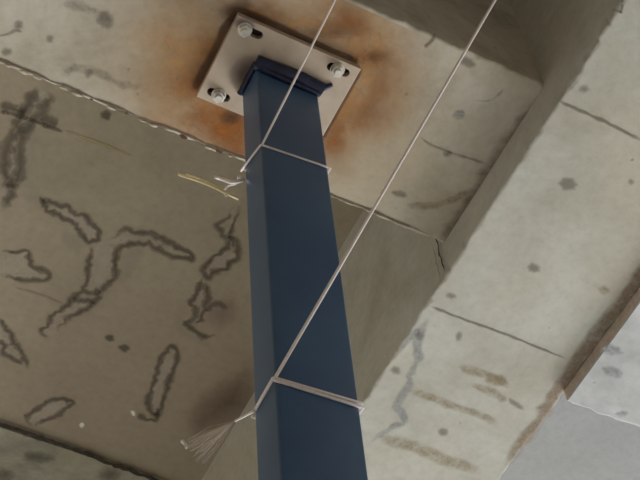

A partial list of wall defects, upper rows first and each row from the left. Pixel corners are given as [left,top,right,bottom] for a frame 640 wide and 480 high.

water stain [0,92,57,203]
corrosion [162,8,244,153]
corrosion [247,12,399,148]